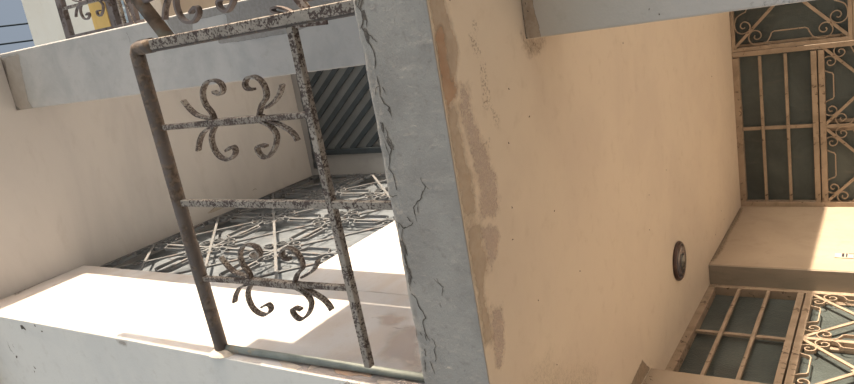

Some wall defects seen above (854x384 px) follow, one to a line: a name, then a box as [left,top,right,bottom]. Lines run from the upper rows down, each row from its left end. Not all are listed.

damp [430,0,458,84]
crack [355,0,443,374]
damp [448,107,474,215]